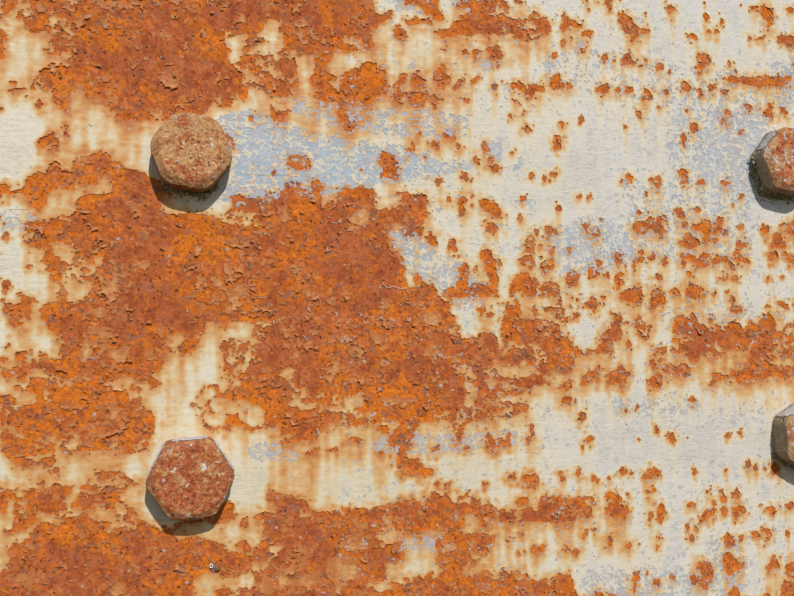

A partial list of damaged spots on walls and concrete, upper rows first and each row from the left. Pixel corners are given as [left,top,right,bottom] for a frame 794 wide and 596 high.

peeling [218,98,474,208]
peeling [545,44,794,276]
rust [568,186,613,258]
rust [611,161,676,328]
rust [666,162,761,309]
peeling [663,305,763,334]
peeling [400,536,444,551]
peeling [374,431,518,455]
rust [519,441,572,496]
rust [565,401,681,596]
peeling [582,536,750,596]
rust [662,280,794,596]